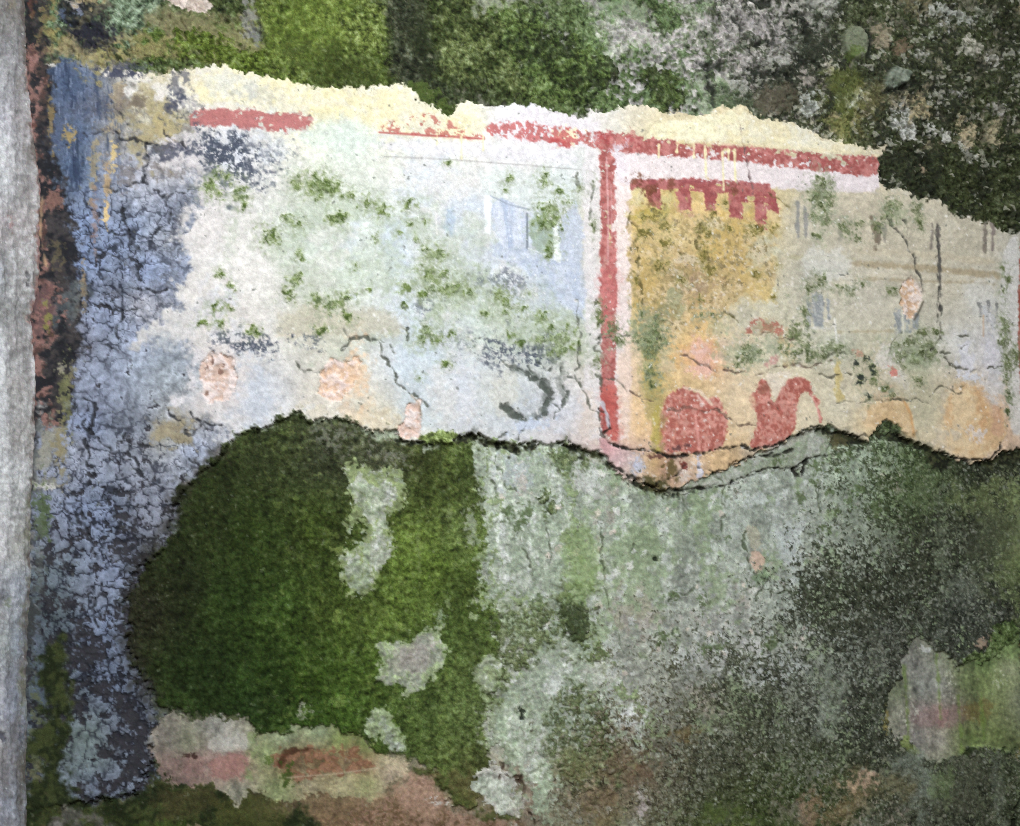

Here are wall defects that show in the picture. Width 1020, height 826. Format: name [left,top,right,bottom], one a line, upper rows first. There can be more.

flaking render [168,0,214,14]
flaking render [869,0,1001,68]
flaking render [888,90,1007,164]
crack [887,217,997,395]
crack [25,51,223,807]
flaking render [454,434,537,457]
crack [491,466,518,522]
crack [499,315,868,514]
spalling [632,427,952,500]
crack [951,445,1002,463]
crack [756,582,817,617]
flaking render [885,637,1020,763]